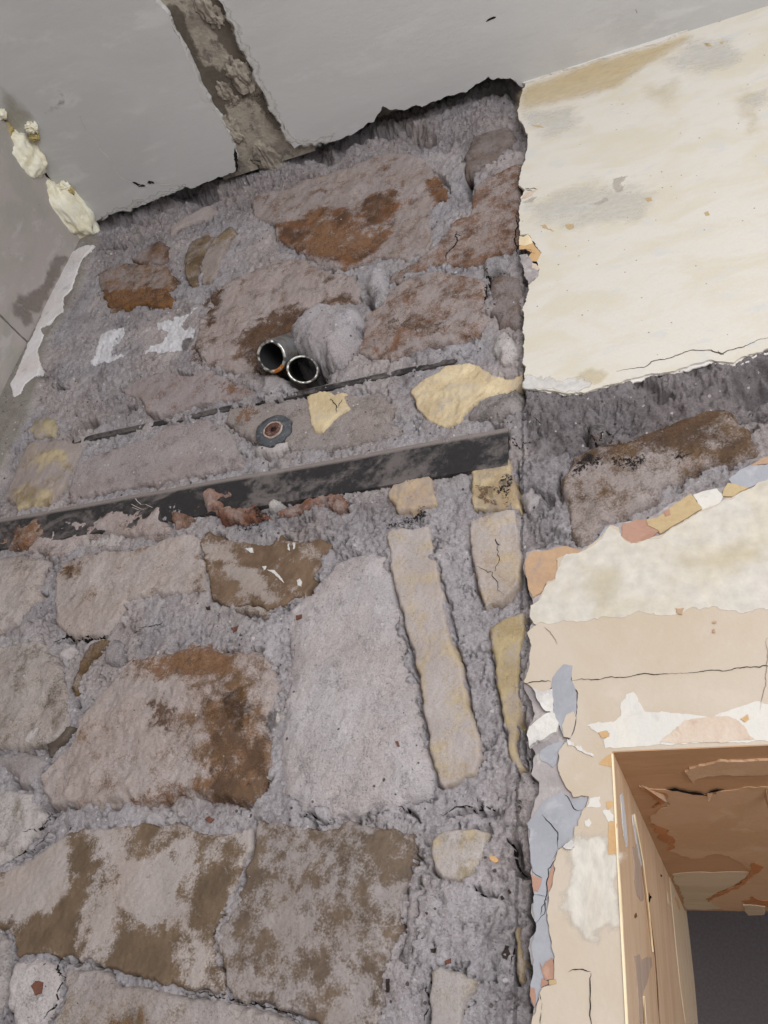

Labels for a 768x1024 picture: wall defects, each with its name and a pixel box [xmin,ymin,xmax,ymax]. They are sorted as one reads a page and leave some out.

flaking render [0,78,768,565]
crack [624,338,765,370]
flaking render [0,533,344,874]
flaking render [162,474,589,1024]
peeling [606,801,617,855]
crack [525,645,768,701]
peeling [639,758,768,916]
flaking render [0,929,319,1024]